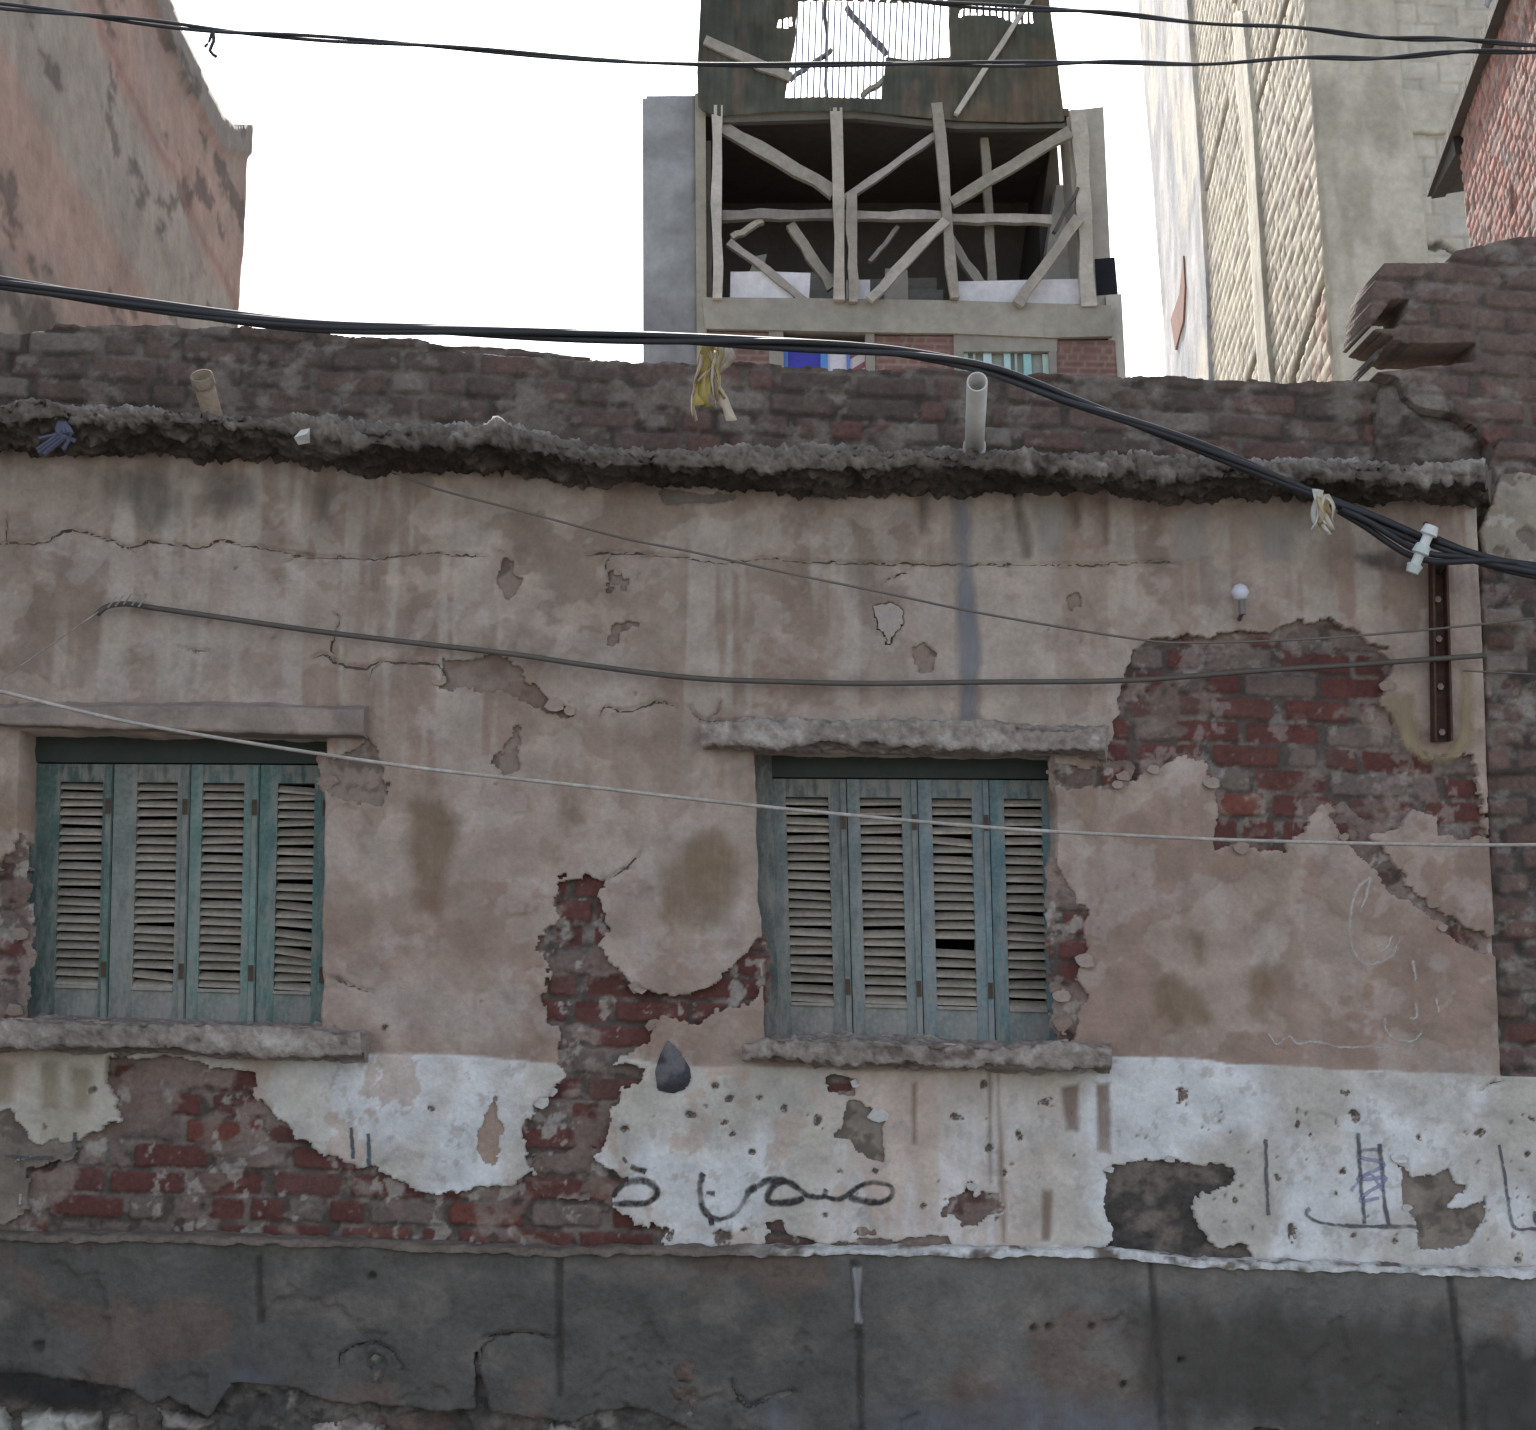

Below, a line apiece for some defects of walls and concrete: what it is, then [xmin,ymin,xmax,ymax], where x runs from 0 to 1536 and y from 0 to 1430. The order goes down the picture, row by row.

crack [0,520,484,561]
flaking render [431,654,575,718]
peeling [873,603,904,644]
flaking render [912,642,937,674]
flaking render [491,726,522,775]
flaking render [1046,618,1486,855]
flaking render [0,833,37,1019]
flaking render [0,873,772,1246]
peeling [814,1074,889,1162]
flaking render [762,1170,1007,1246]
flaking render [1103,1155,1251,1258]